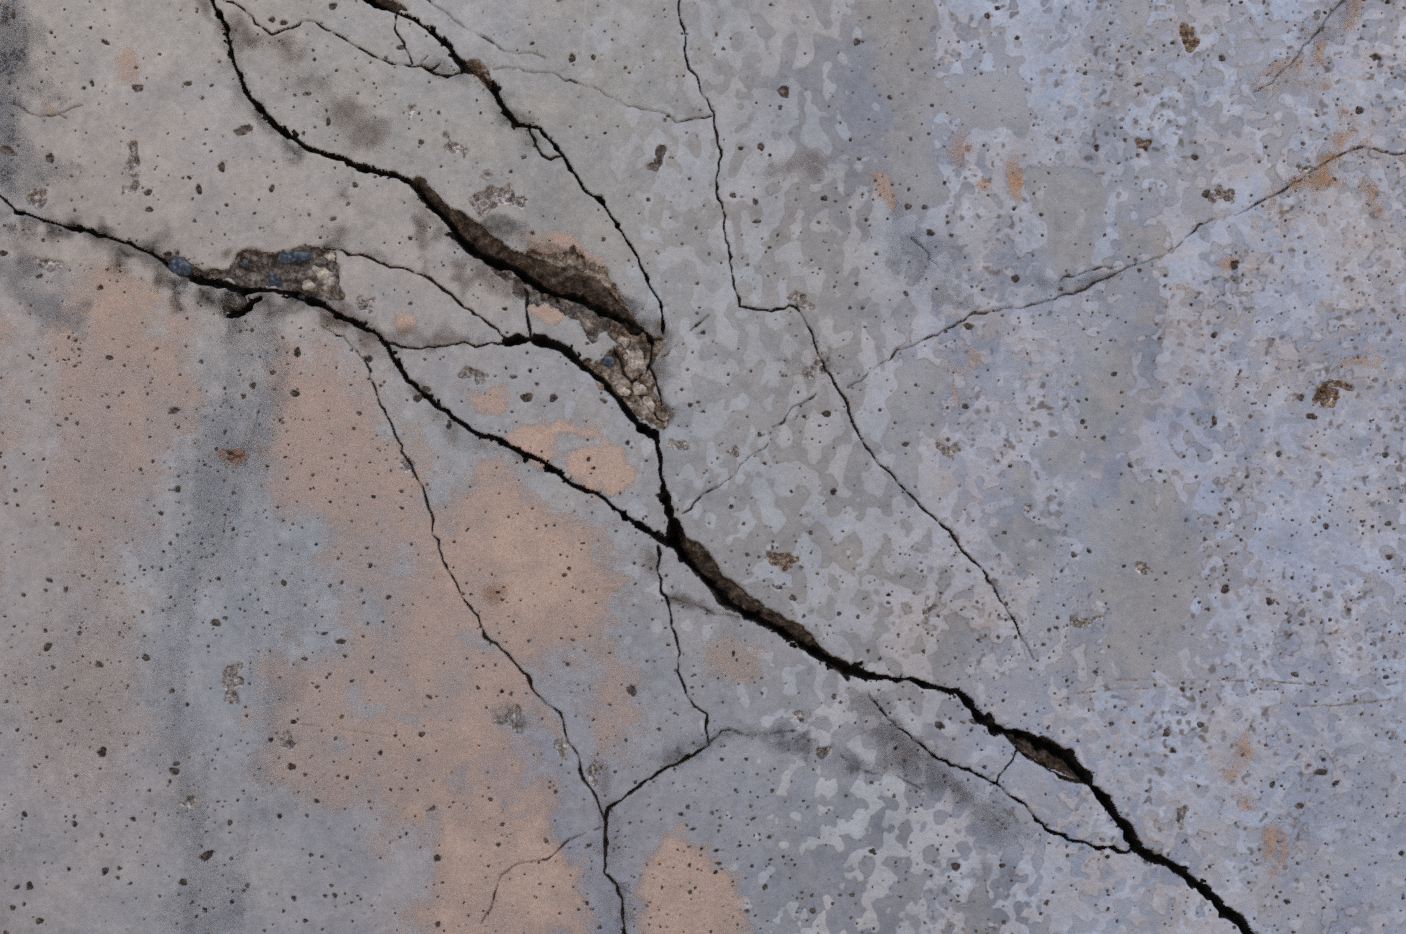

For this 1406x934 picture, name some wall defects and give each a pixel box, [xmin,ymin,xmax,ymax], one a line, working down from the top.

hole [468,171,528,218]
crack [1253,146,1406,206]
crack [0,195,169,267]
spalling [162,245,375,315]
spalling [458,365,489,384]
crack [187,0,1254,934]
peeling [486,0,1406,934]
crack [1301,684,1327,708]